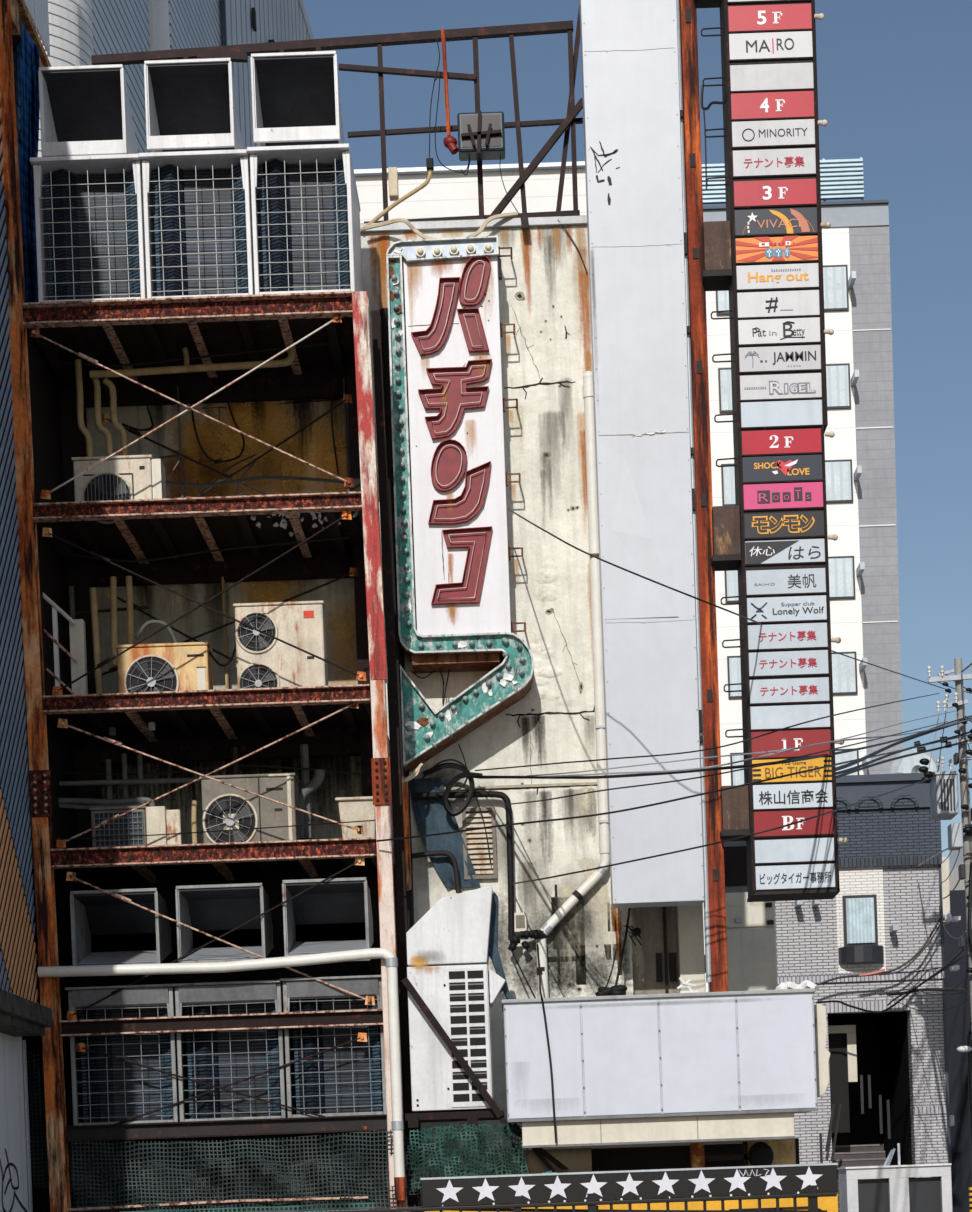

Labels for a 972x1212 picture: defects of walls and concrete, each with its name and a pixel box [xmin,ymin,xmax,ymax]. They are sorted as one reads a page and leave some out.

rust [370,234,388,305]
rust [522,226,589,332]
damp [168,399,351,498]
damp [522,717,543,752]
damp [520,886,584,989]
damp [583,859,632,972]